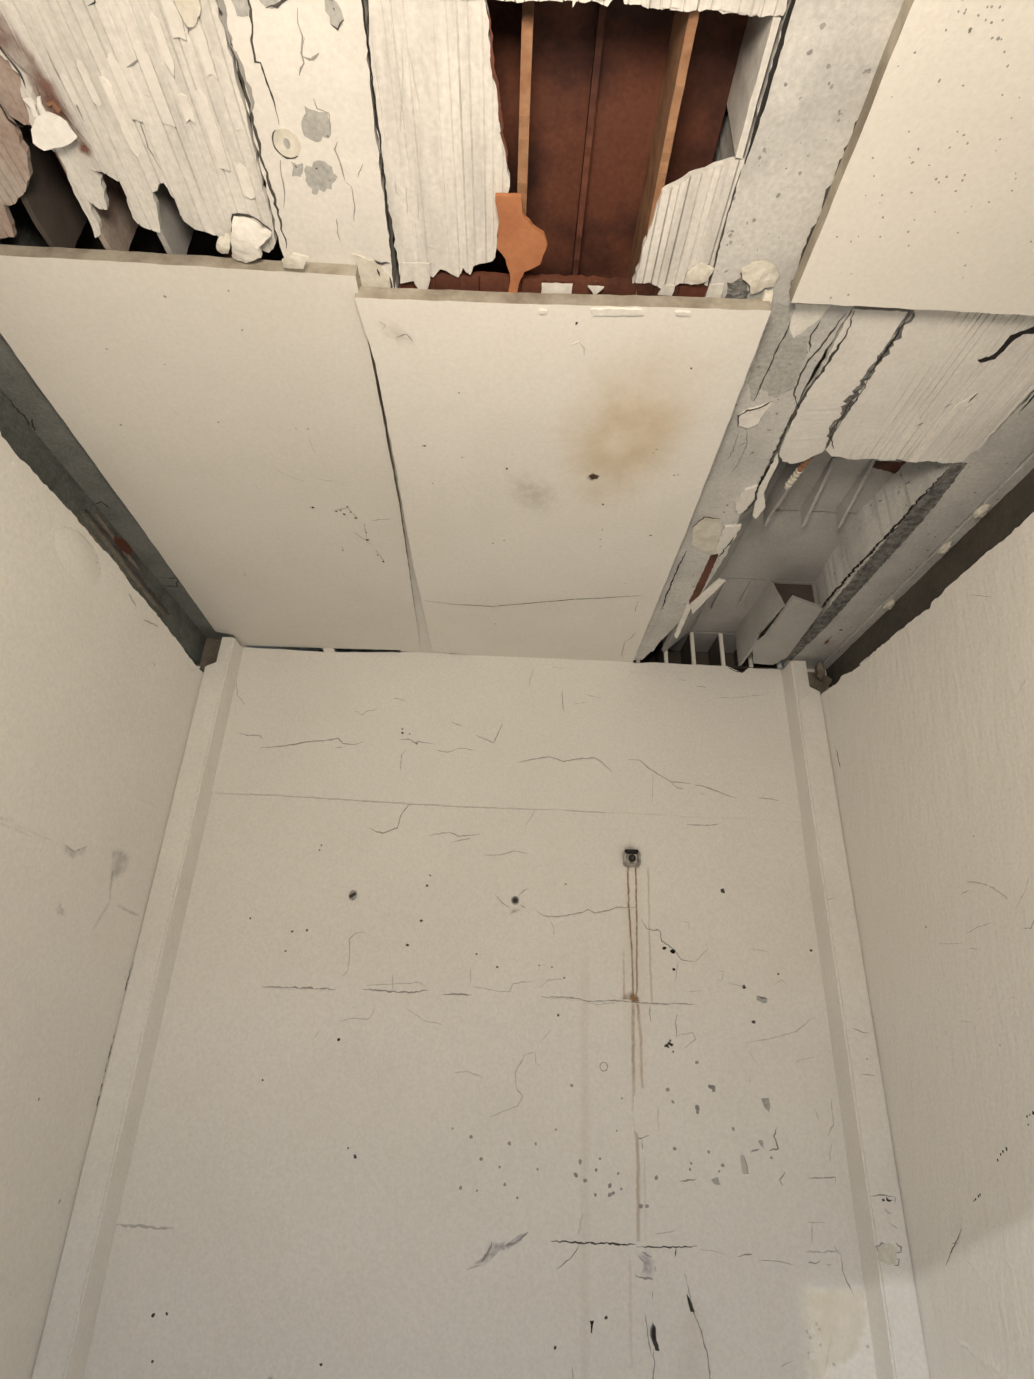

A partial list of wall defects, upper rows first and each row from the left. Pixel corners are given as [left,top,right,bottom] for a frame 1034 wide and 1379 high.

peeling [715,0,760,15]
peeling [352,254,430,289]
peeling [495,193,547,293]
spalling [540,283,643,316]
peeling [658,260,812,402]
spalling [643,452,778,652]
crack [236,680,405,748]
crack [218,793,602,856]
crack [400,722,779,826]
rust [627,867,638,1003]
crack [262,906,743,1118]
crack [551,1213,854,1379]